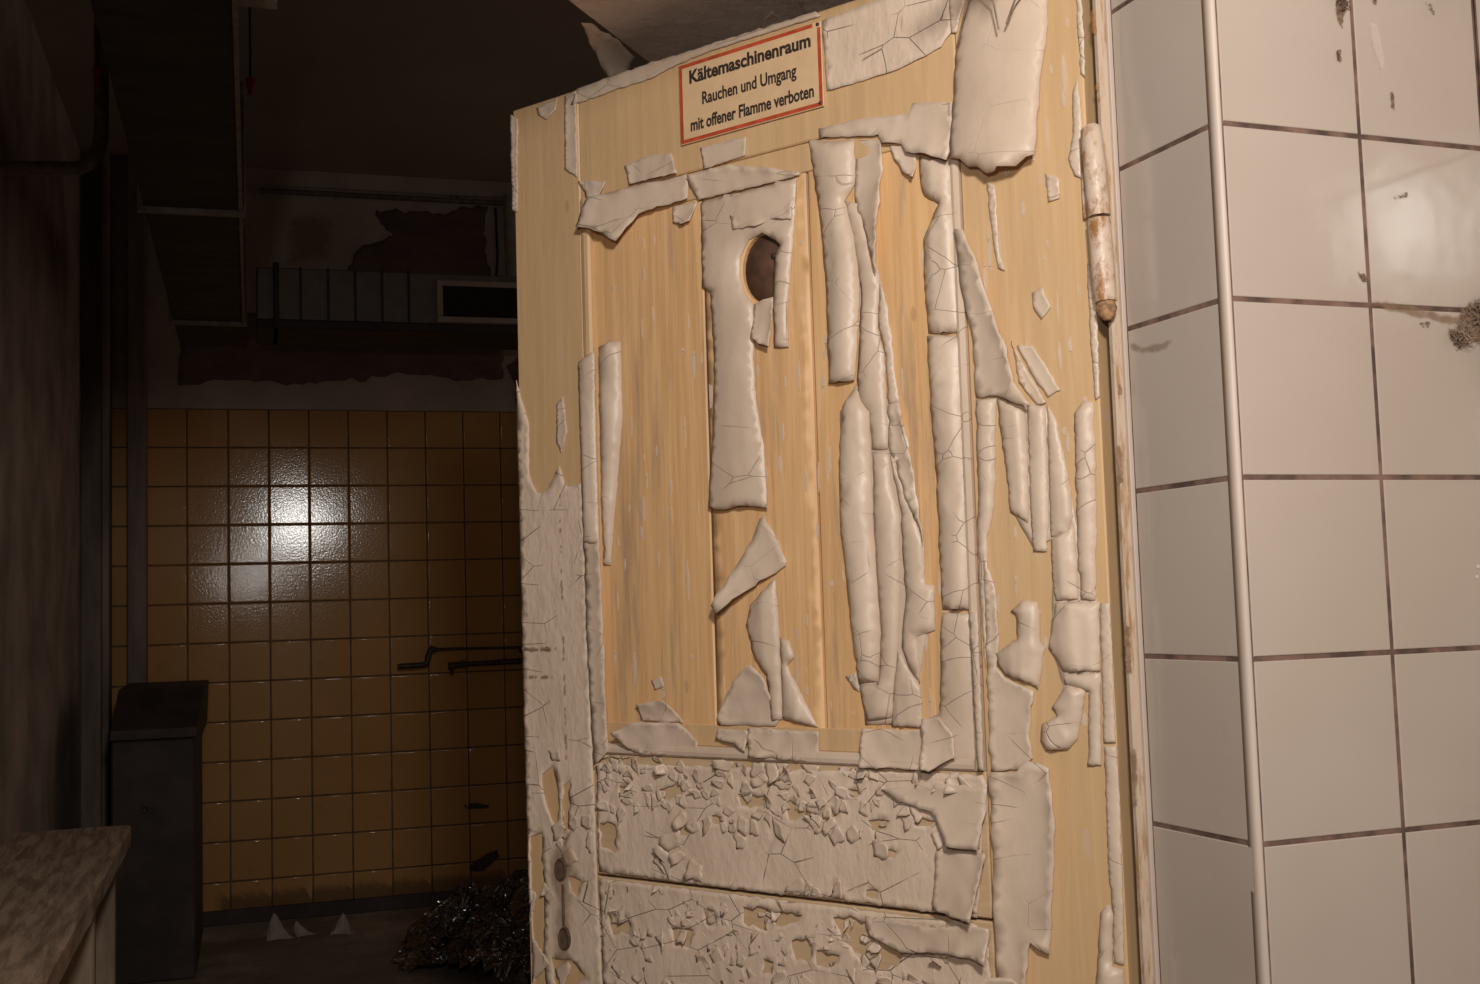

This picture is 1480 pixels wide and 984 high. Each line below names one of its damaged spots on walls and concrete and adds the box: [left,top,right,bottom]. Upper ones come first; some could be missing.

mould [1335,0,1351,26]
flaking render [348,196,491,276]
flaking render [178,313,519,409]
peeling [551,0,1137,984]
peeling [529,882,571,984]